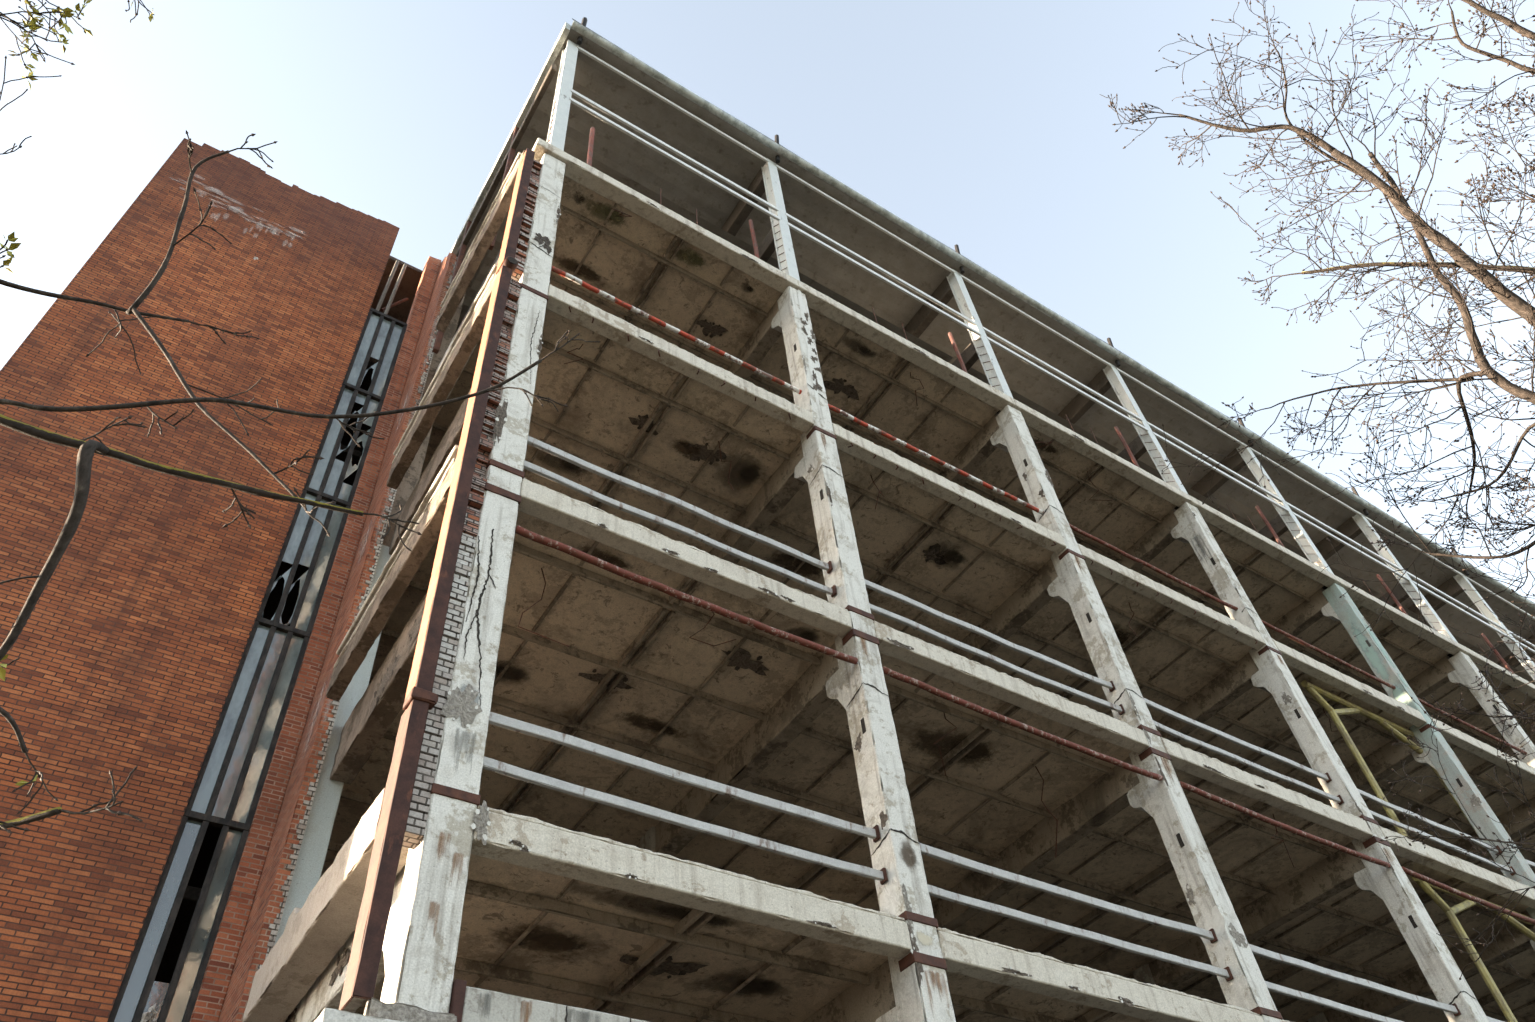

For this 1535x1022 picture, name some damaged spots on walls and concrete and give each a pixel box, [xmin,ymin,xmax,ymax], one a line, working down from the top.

water stain [558,258,598,281]
water stain [581,547,627,568]
water stain [773,553,820,576]
water stain [1113,625,1128,645]
water stain [495,664,521,680]
spalling [441,683,482,728]
water stain [623,714,676,735]
water stain [919,732,991,763]
water stain [902,843,916,867]
water stain [603,895,726,925]
water stain [498,926,583,953]
water stain [714,974,773,994]